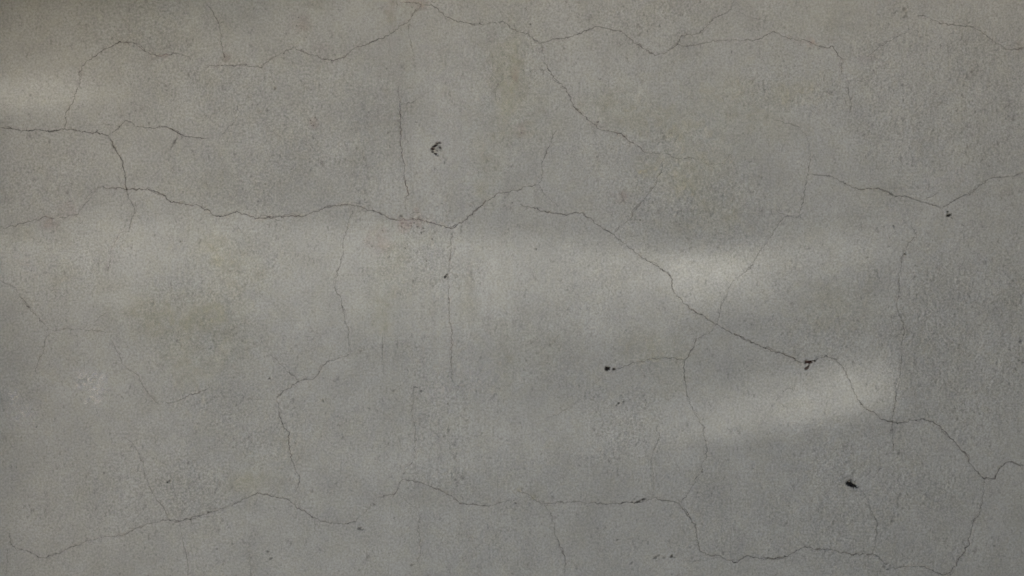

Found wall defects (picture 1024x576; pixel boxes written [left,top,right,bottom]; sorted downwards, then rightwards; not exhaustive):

crack [8,91,142,190]